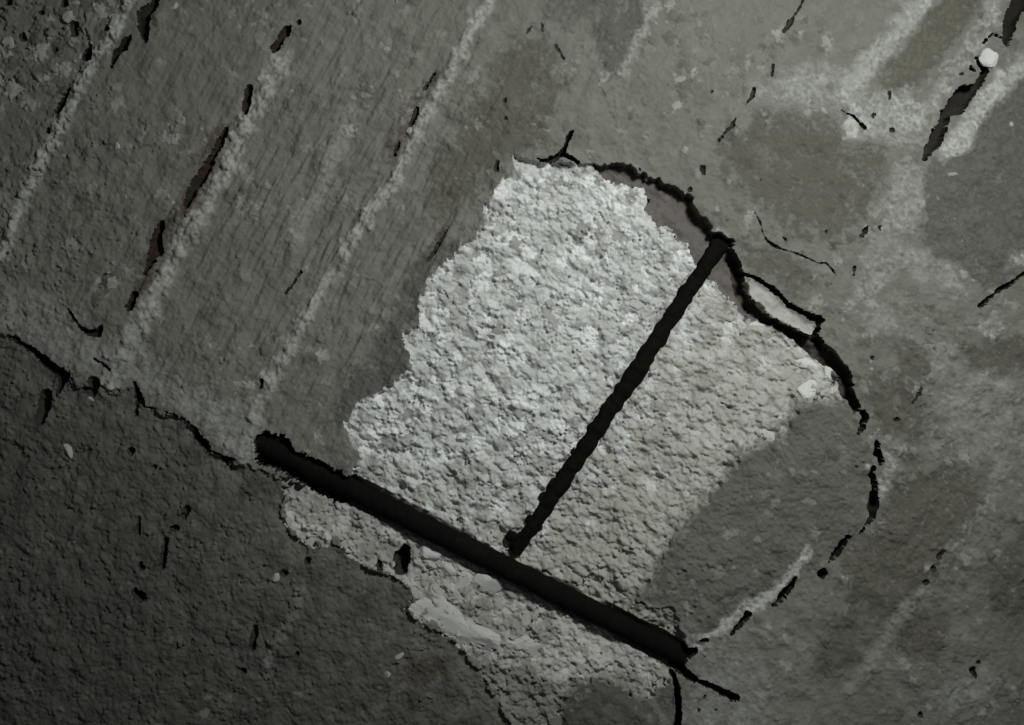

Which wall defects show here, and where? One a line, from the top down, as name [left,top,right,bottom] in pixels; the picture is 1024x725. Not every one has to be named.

crack [393,72,436,157]
leakage [430,36,558,217]
crack [537,130,580,165]
crack [922,0,1024,161]
crack [426,226,450,264]
crack [754,212,836,275]
crack [7,334,71,394]
leakage [3,292,255,462]
crack [68,308,235,470]
leakage [335,239,460,423]
spalling [0,153,845,725]
crack [668,249,885,725]